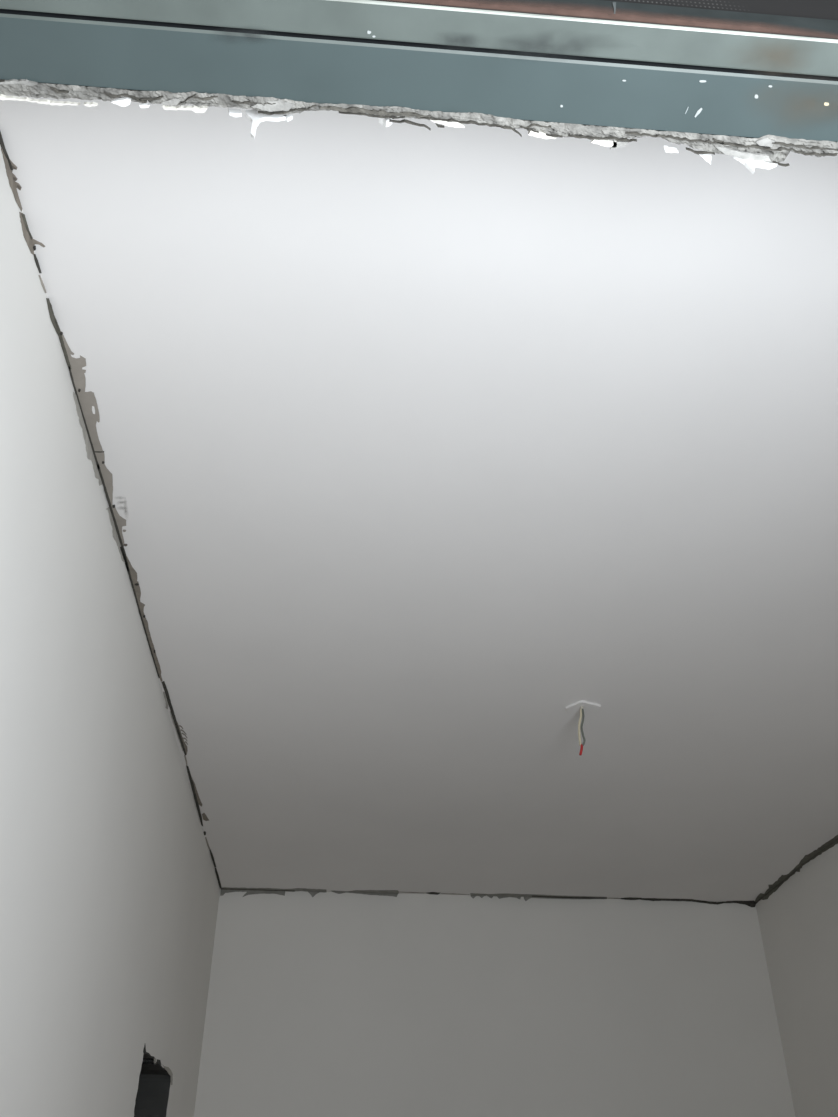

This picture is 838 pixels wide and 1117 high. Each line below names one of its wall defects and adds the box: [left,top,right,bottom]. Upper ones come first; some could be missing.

peeling [1,148,45,255]
peeling [60,331,188,755]
crack [402,835,838,907]